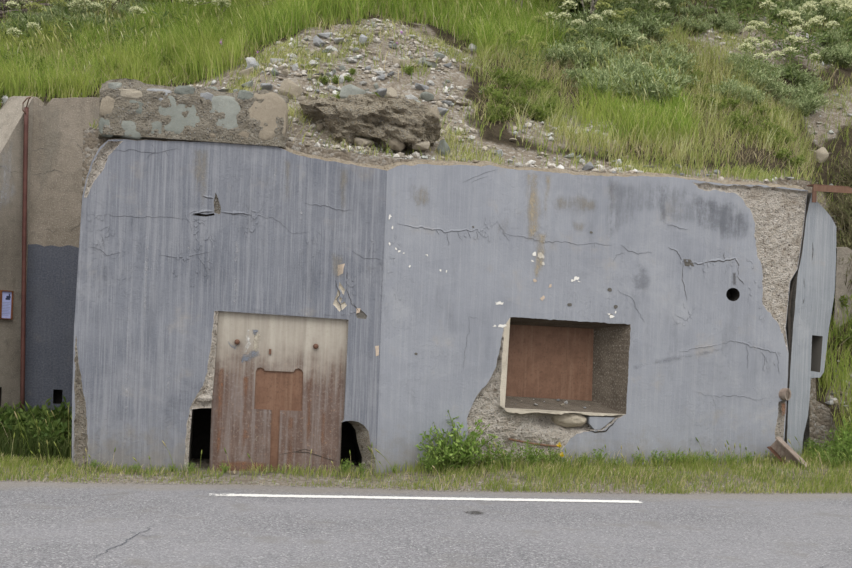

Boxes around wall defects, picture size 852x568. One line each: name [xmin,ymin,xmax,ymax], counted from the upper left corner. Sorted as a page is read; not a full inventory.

crack [49,193,304,256]
crack [335,272,358,311]
peeling [333,263,375,321]
crack [398,223,744,321]
crack [679,194,813,381]
spalling [693,182,807,351]
spalling [184,311,218,471]
spalling [467,324,623,465]